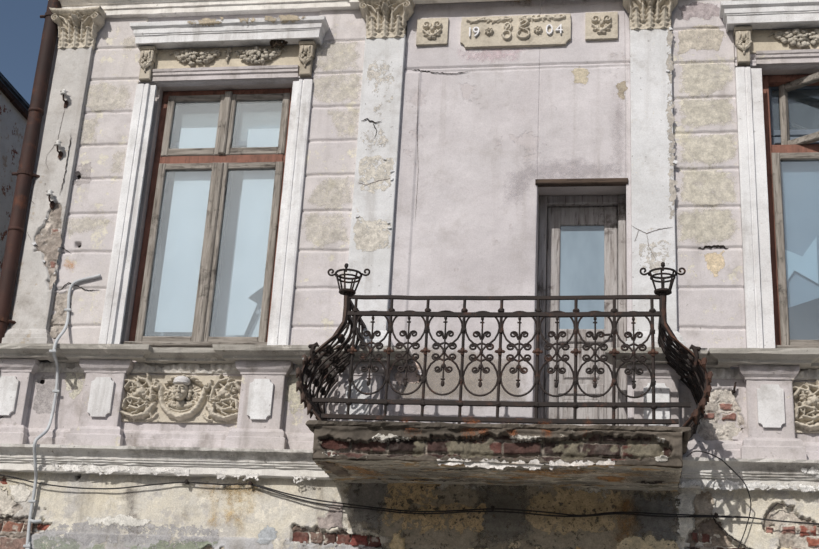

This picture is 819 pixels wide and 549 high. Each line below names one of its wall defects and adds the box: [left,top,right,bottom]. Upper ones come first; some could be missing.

flaking render [32,203,109,338]
peeling [29,460,190,476]
peeling [0,476,224,549]
peeling [216,472,259,481]
peeling [256,525,277,544]
flaking render [291,500,382,548]
peeling [382,483,492,545]
flaking render [317,433,672,477]
peeling [520,487,632,549]
flaking render [617,462,819,549]